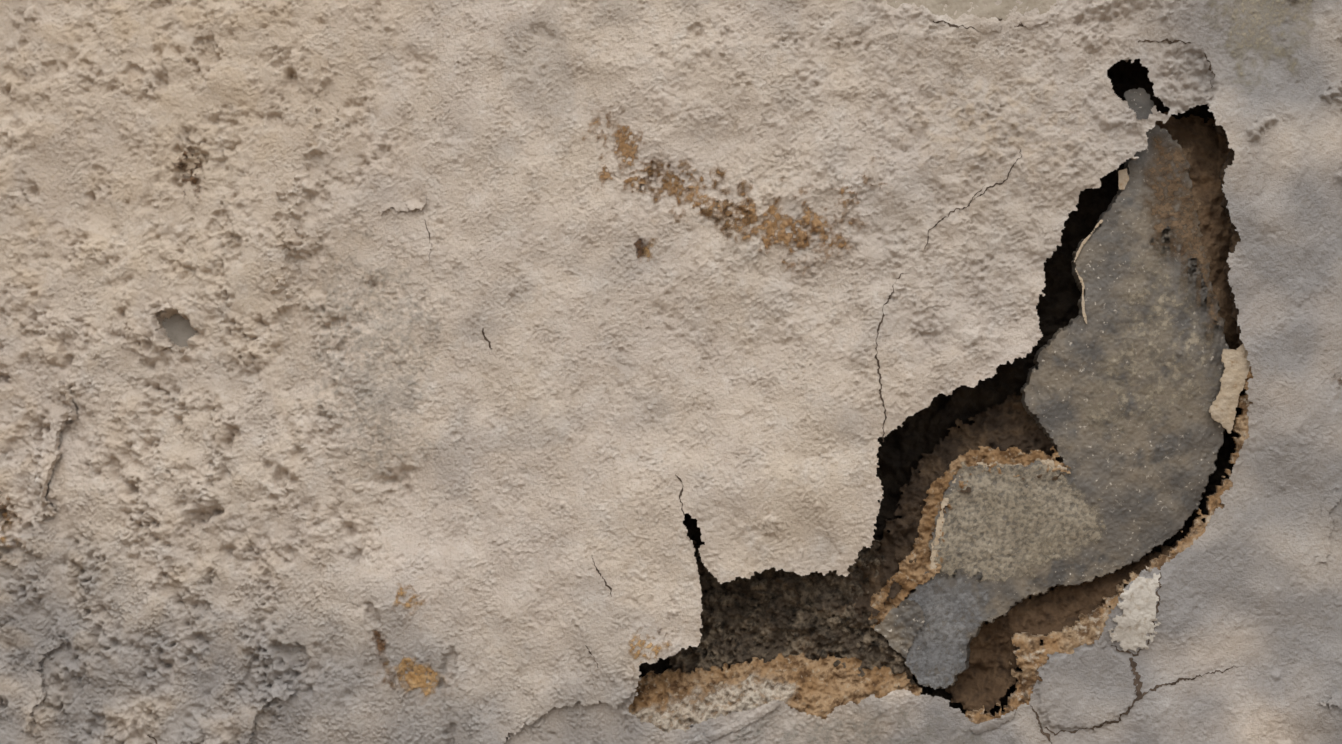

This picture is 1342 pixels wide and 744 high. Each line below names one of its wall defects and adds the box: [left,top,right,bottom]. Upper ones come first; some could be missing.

rust [583,117,859,265]
spalling [469,59,1254,744]
rust [373,630,438,696]
crack [1030,572,1238,743]
flaking render [1319,689,1342,709]